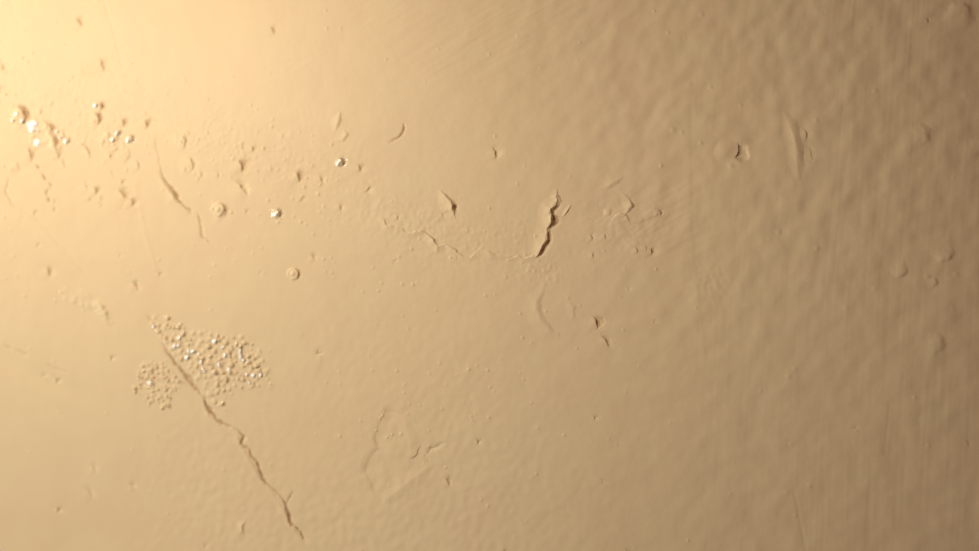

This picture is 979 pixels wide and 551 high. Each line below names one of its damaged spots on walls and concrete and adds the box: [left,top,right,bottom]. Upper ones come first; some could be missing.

crack [153,134,216,246]
crack [162,343,307,543]